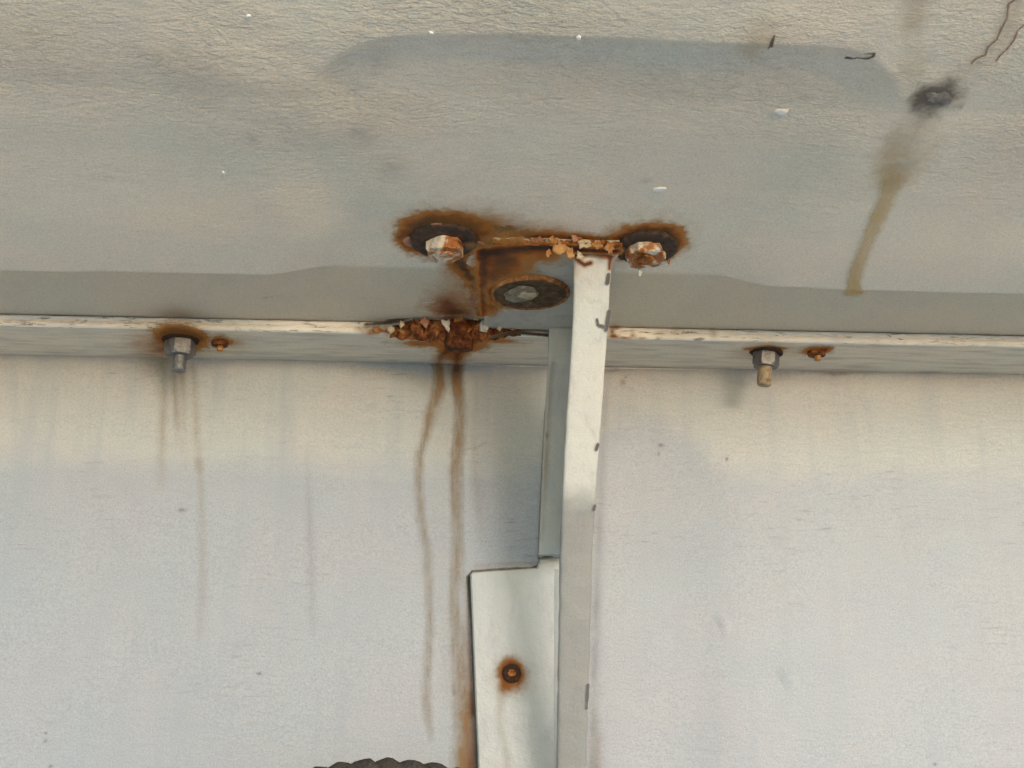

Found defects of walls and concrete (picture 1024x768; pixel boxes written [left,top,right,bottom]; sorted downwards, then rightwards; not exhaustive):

crack [971,0,1024,64]
water stain [846,180,897,296]
corrosion [152,323,233,353]
corrosion [364,210,689,492]
corrosion [802,346,834,355]
corrosion [498,658,525,691]
corrosion [457,661,475,768]